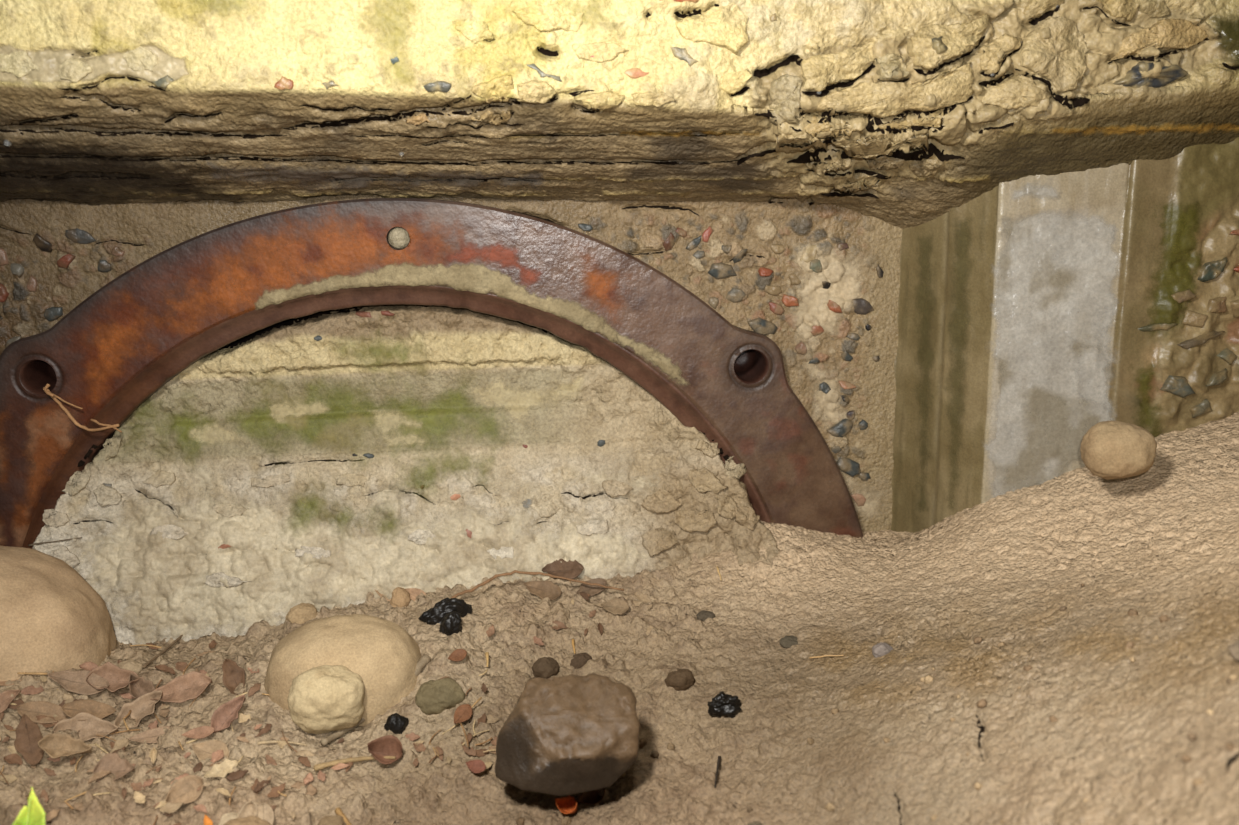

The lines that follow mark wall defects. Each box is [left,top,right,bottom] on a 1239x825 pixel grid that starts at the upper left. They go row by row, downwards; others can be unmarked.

peeling [0,45,189,89]
crack [0,76,738,202]
peeling [471,63,562,125]
crack [537,47,559,56]
peeling [660,0,749,67]
spalling [720,0,1239,207]
crack [622,205,699,216]
corrosion [167,219,540,333]
corrosion [78,300,143,407]
corrosion [0,407,73,547]
leakage [171,415,215,451]
leakage [84,468,647,643]